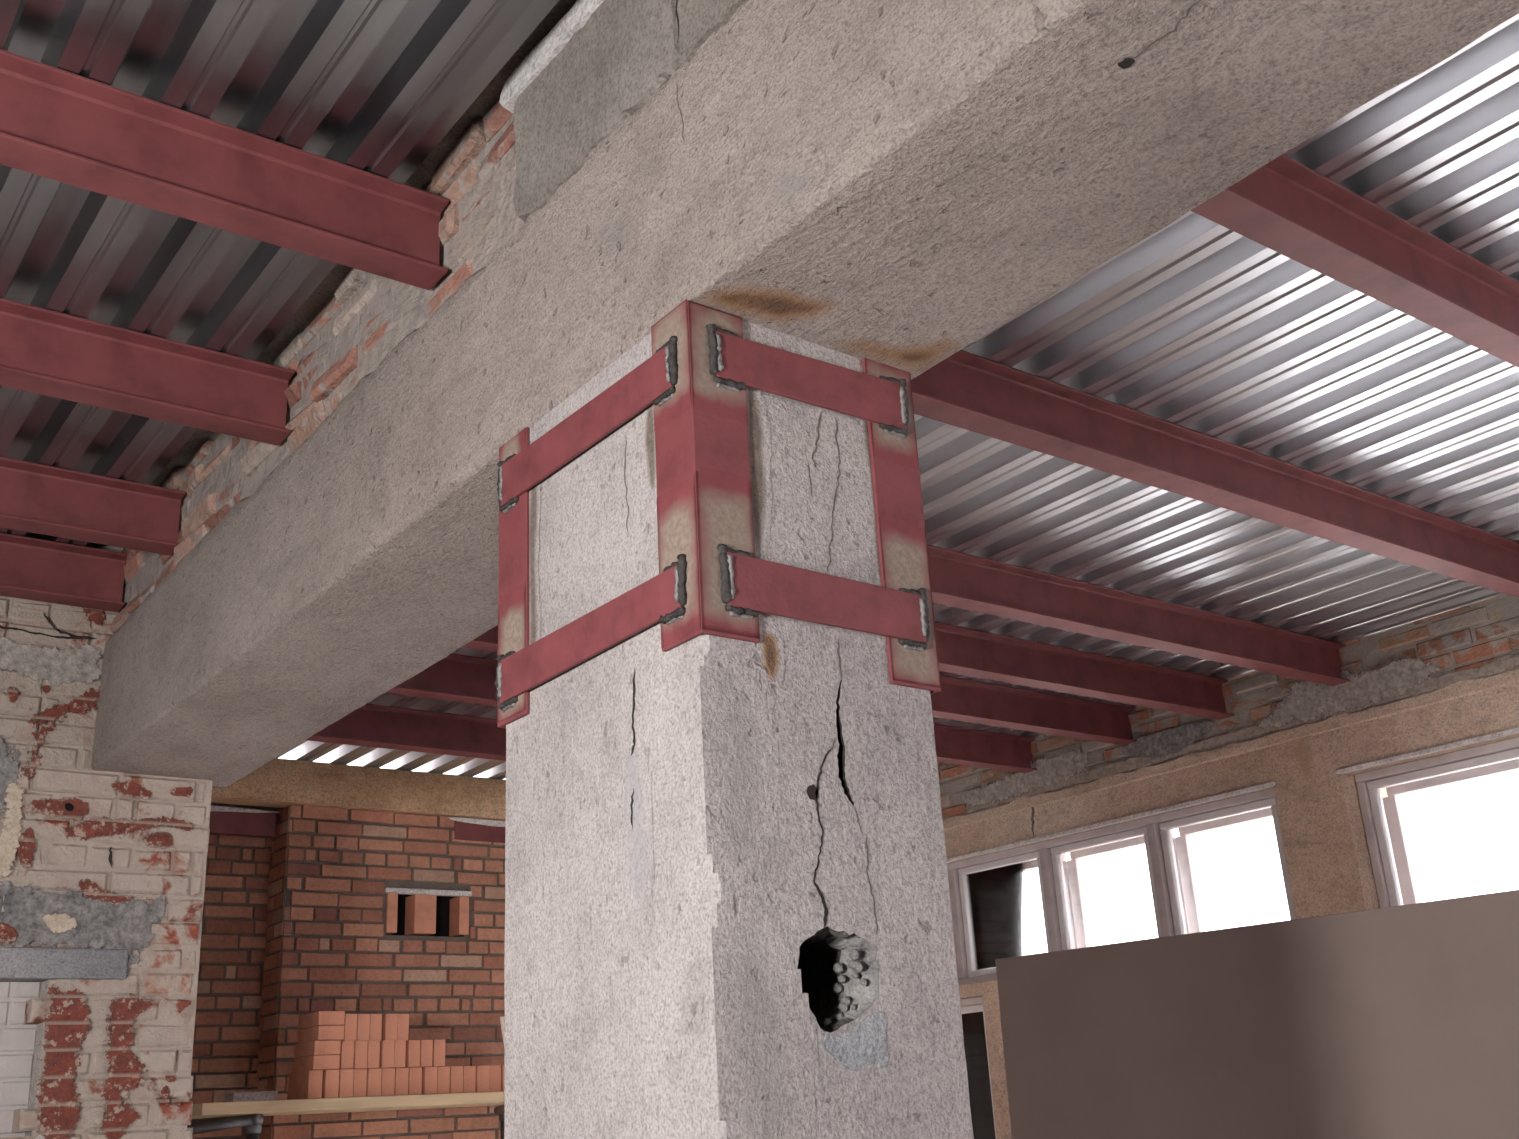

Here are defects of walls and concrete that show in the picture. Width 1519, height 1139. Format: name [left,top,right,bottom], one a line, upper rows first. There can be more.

peeling [675,0,748,63]
corrosion [691,270,985,380]
crack [807,411,841,574]
corrosion [756,623,787,688]
peeling [0,685,194,878]
crack [628,669,636,828]
crack [807,640,878,935]
flaking render [42,913,77,933]
peeling [79,878,132,903]
spalling [797,927,880,1032]
peeling [35,984,152,1139]
peeling [161,1075,181,1107]